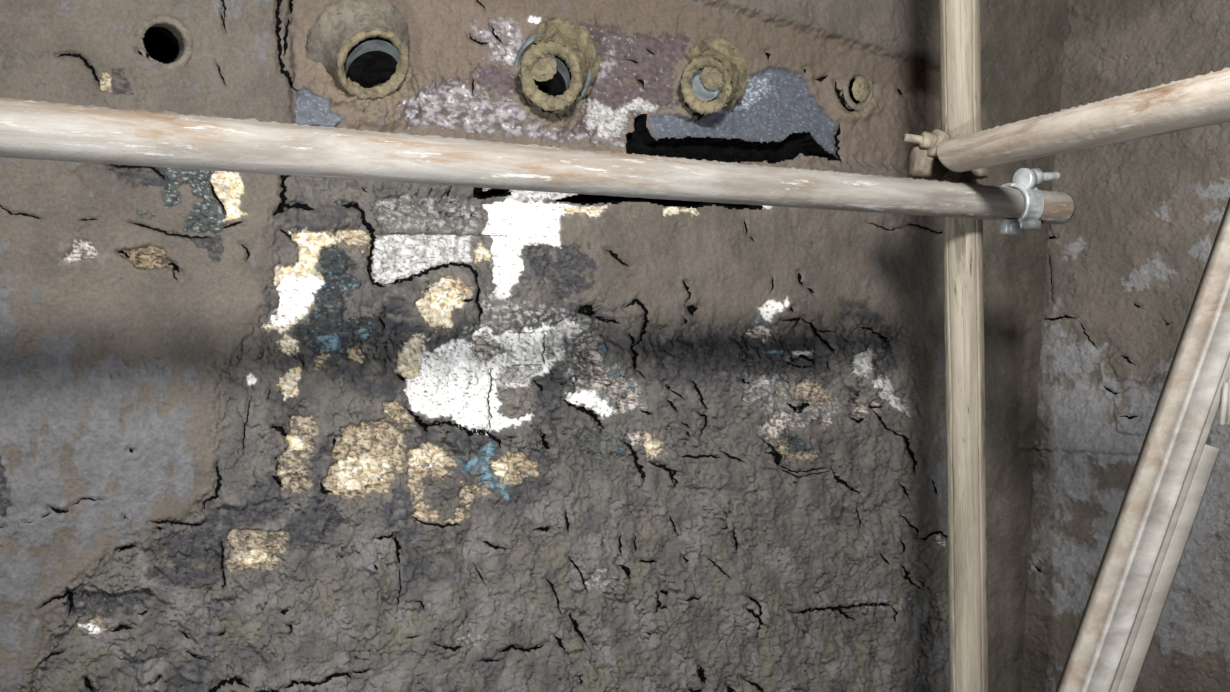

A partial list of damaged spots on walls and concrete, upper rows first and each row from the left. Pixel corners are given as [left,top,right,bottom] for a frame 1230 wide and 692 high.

spalling [648,67,837,156]
spalling [210,171,248,221]
spalling [663,206,699,216]
crack [396,374,502,449]
spalling [261,188,646,524]
spalling [744,298,789,343]
crack [770,272,890,384]
spalling [756,348,911,464]
crack [533,298,898,638]
crack [850,406,948,590]
crack [356,508,588,662]
crack [688,665,764,692]